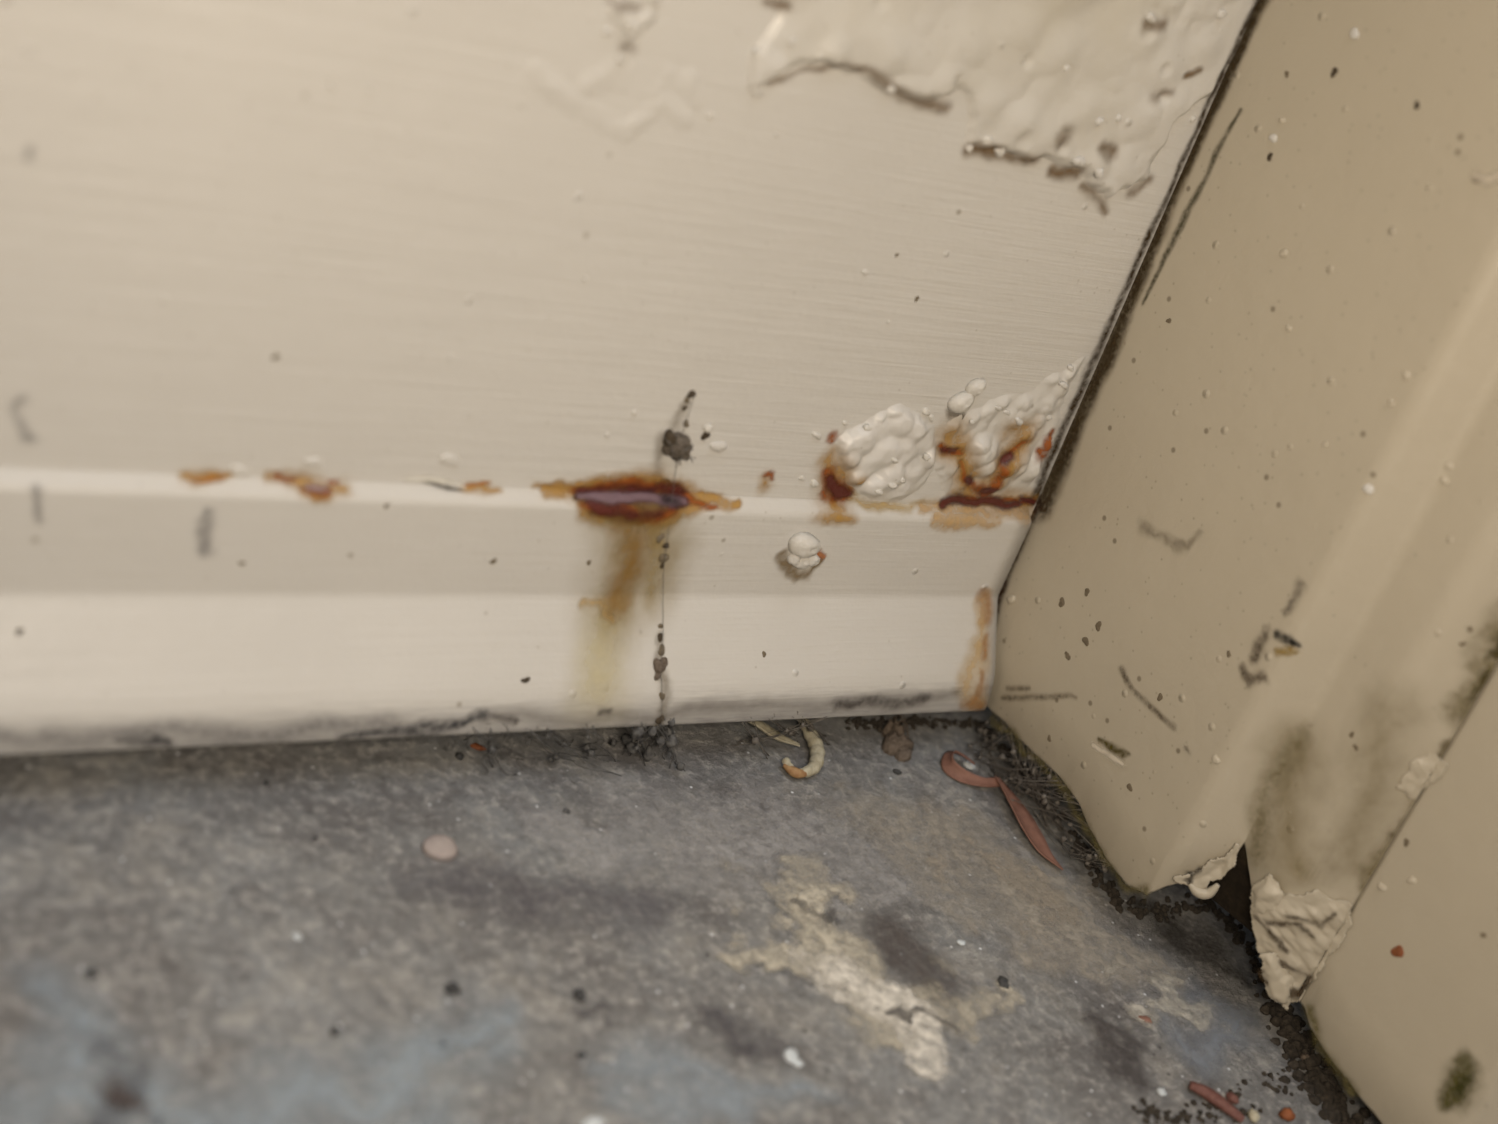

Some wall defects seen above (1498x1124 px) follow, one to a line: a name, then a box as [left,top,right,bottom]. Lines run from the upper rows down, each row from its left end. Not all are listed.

rust [180,471,233,482]
rust [266,473,347,502]
rust [460,481,499,493]
rust [821,432,865,523]
rust [920,424,1054,529]
rust [534,473,741,694]
water stain [1455,627,1498,717]
peeling [1173,843,1240,899]
peeling [1249,873,1353,1011]